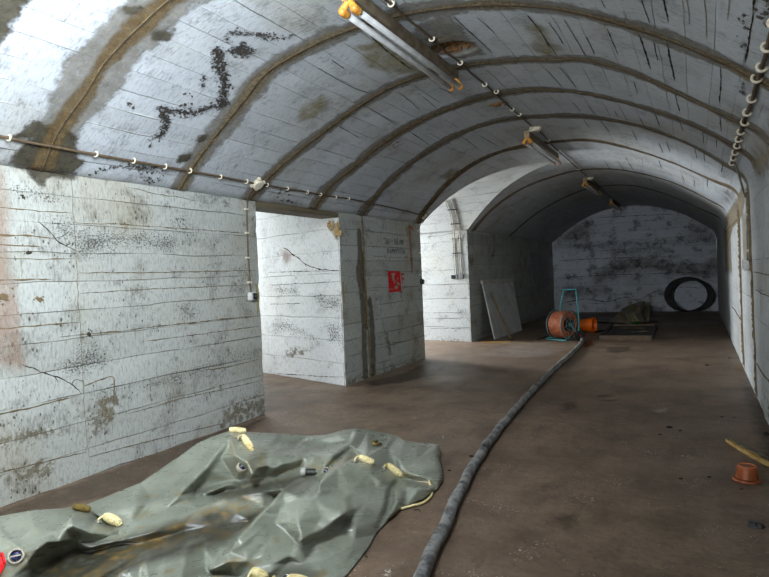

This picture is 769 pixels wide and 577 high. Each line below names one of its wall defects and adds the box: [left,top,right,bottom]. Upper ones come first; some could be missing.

damp [0,0,30,43]
damp [11,0,211,203]
damp [171,20,374,191]
damp [242,43,438,201]
crack [370,36,412,70]
damp [309,0,769,210]
crack [527,15,618,132]
crack [605,0,683,181]
crack [682,67,723,186]
crack [745,0,755,61]
crack [0,180,339,473]
damp [345,113,769,409]